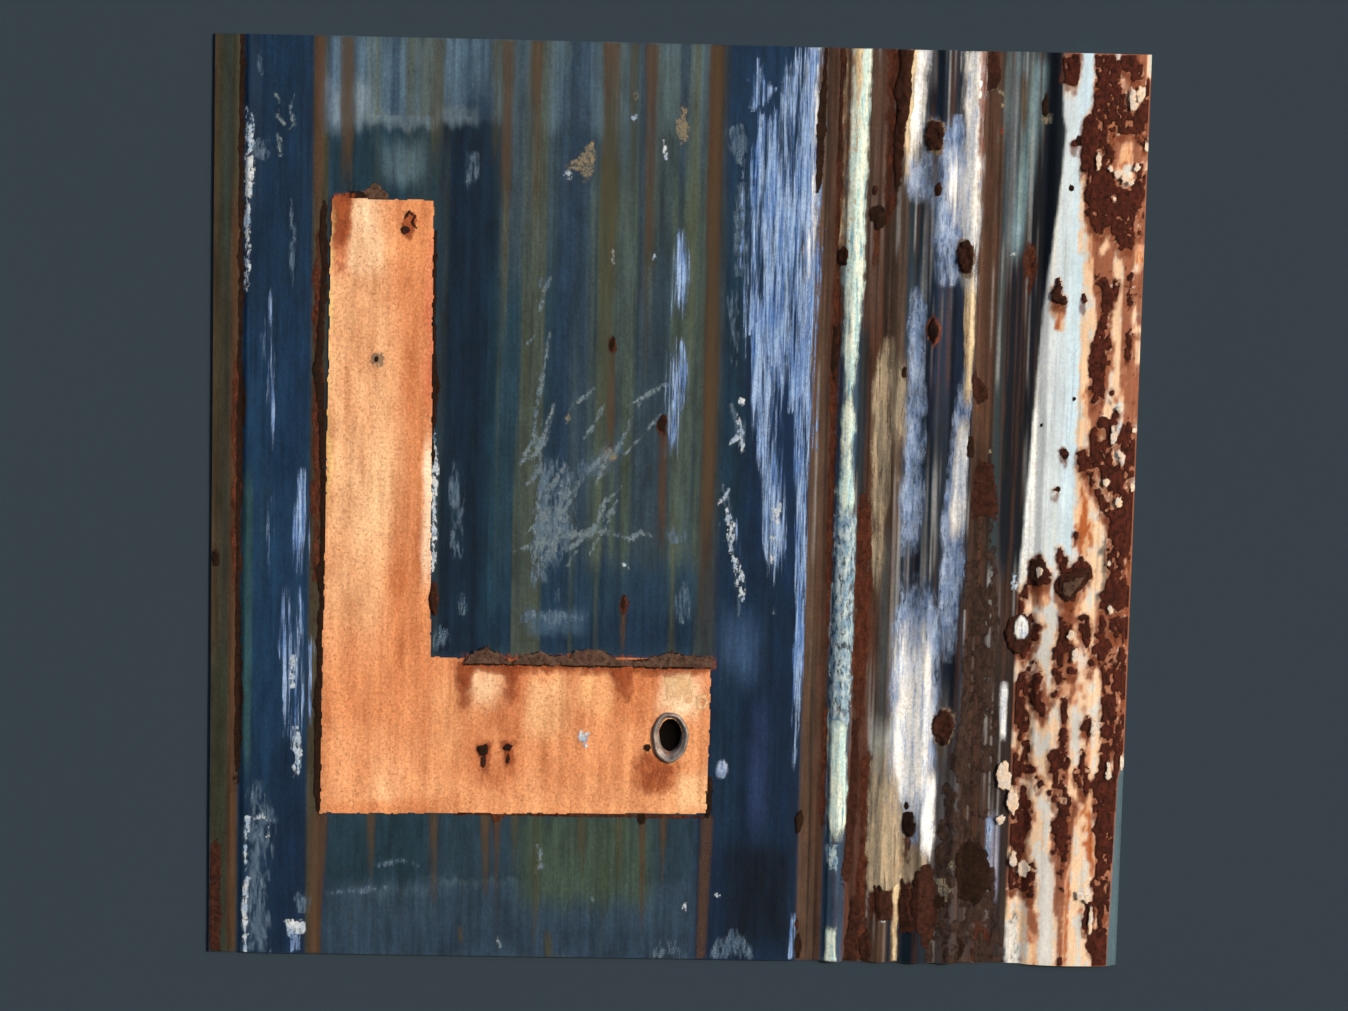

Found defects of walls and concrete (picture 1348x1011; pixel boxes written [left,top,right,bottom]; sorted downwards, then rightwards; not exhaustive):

corrosion [316,37,388,248]
corrosion [429,581,439,616]
corrosion [456,646,713,707]
corrosion [703,45,723,531]
peeling [718,489,745,601]
peeling [729,47,825,762]
corrosion [816,48,849,646]
peeling [825,48,927,872]
peeling [866,50,987,960]
corrosion [840,49,1150,966]
spalling [1005,559,1091,664]
peeling [824,929,836,961]